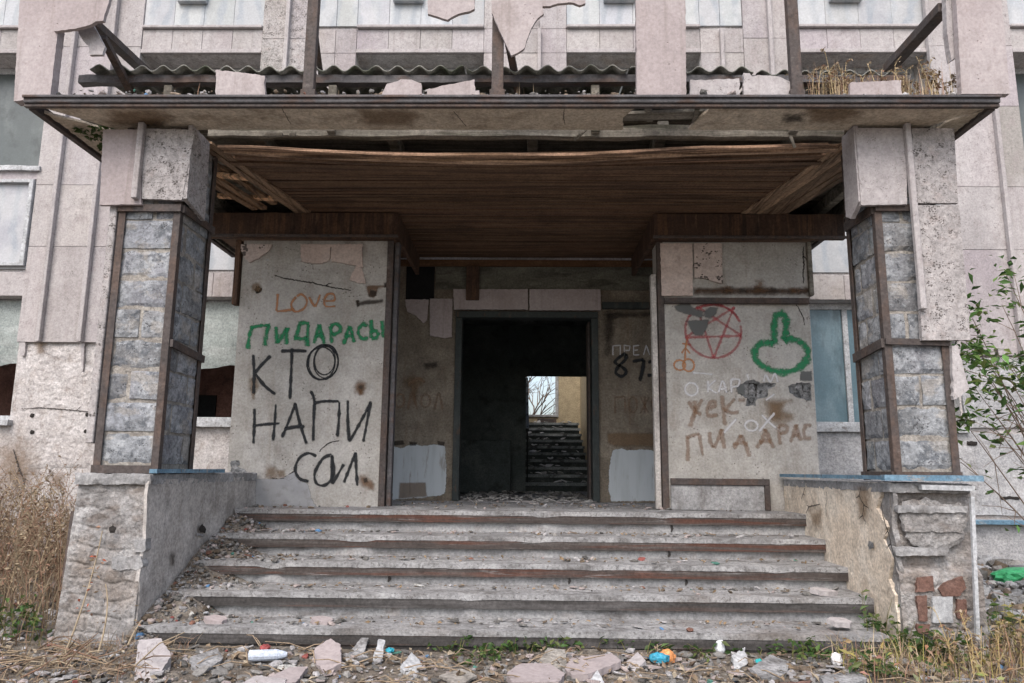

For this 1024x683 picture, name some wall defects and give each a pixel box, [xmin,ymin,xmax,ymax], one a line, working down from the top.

spalling [737,371,812,406]